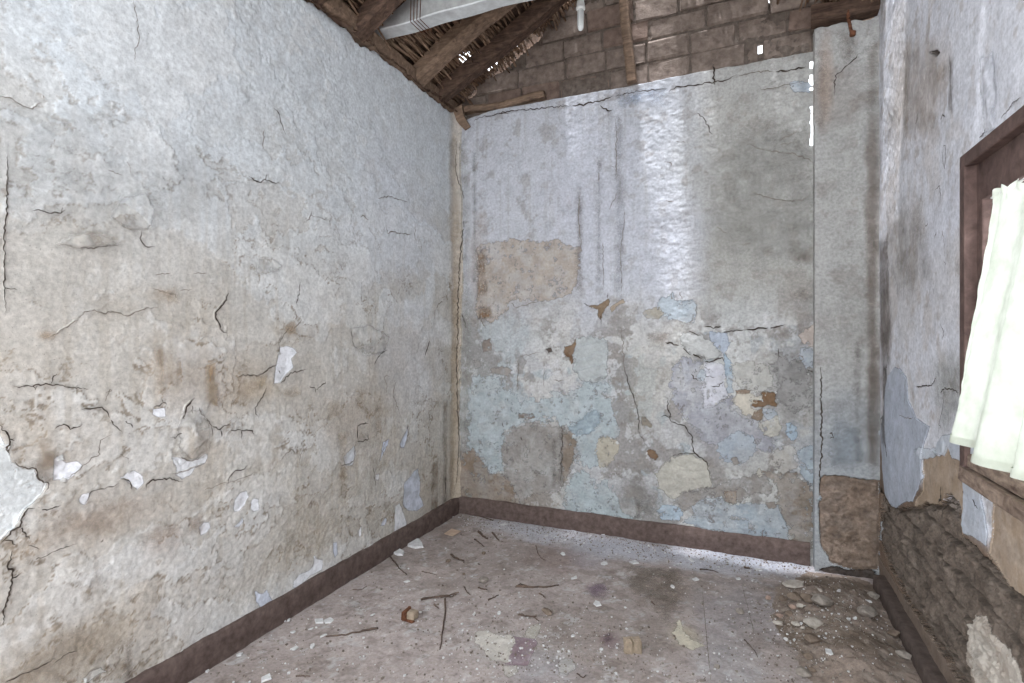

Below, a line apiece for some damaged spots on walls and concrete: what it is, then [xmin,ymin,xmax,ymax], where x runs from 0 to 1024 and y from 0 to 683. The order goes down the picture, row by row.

crack [2,140,64,312]
peeling [0,436,82,540]
crack [0,285,326,626]
peeling [274,346,297,384]
peeling [293,542,338,588]
crack [425,141,487,495]
peeling [474,238,582,323]
peeling [459,336,634,519]
crack [475,67,813,319]
crack [621,335,712,483]
crack [665,294,834,492]
flaking render [643,293,1024,683]